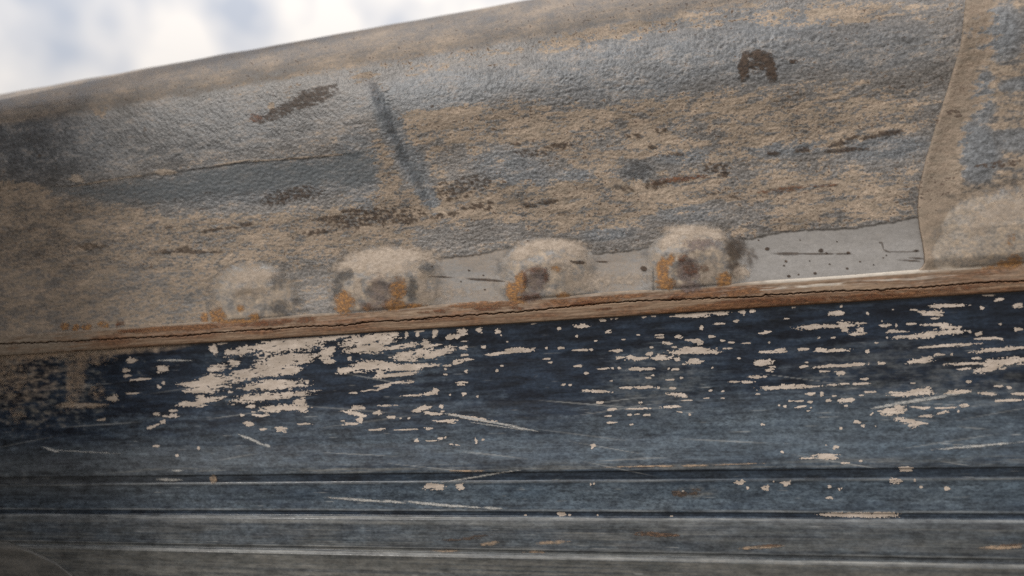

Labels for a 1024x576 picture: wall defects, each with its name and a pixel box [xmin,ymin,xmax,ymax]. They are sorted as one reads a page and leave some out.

peeling [62,294,1024,446]
peeling [799,445,862,464]